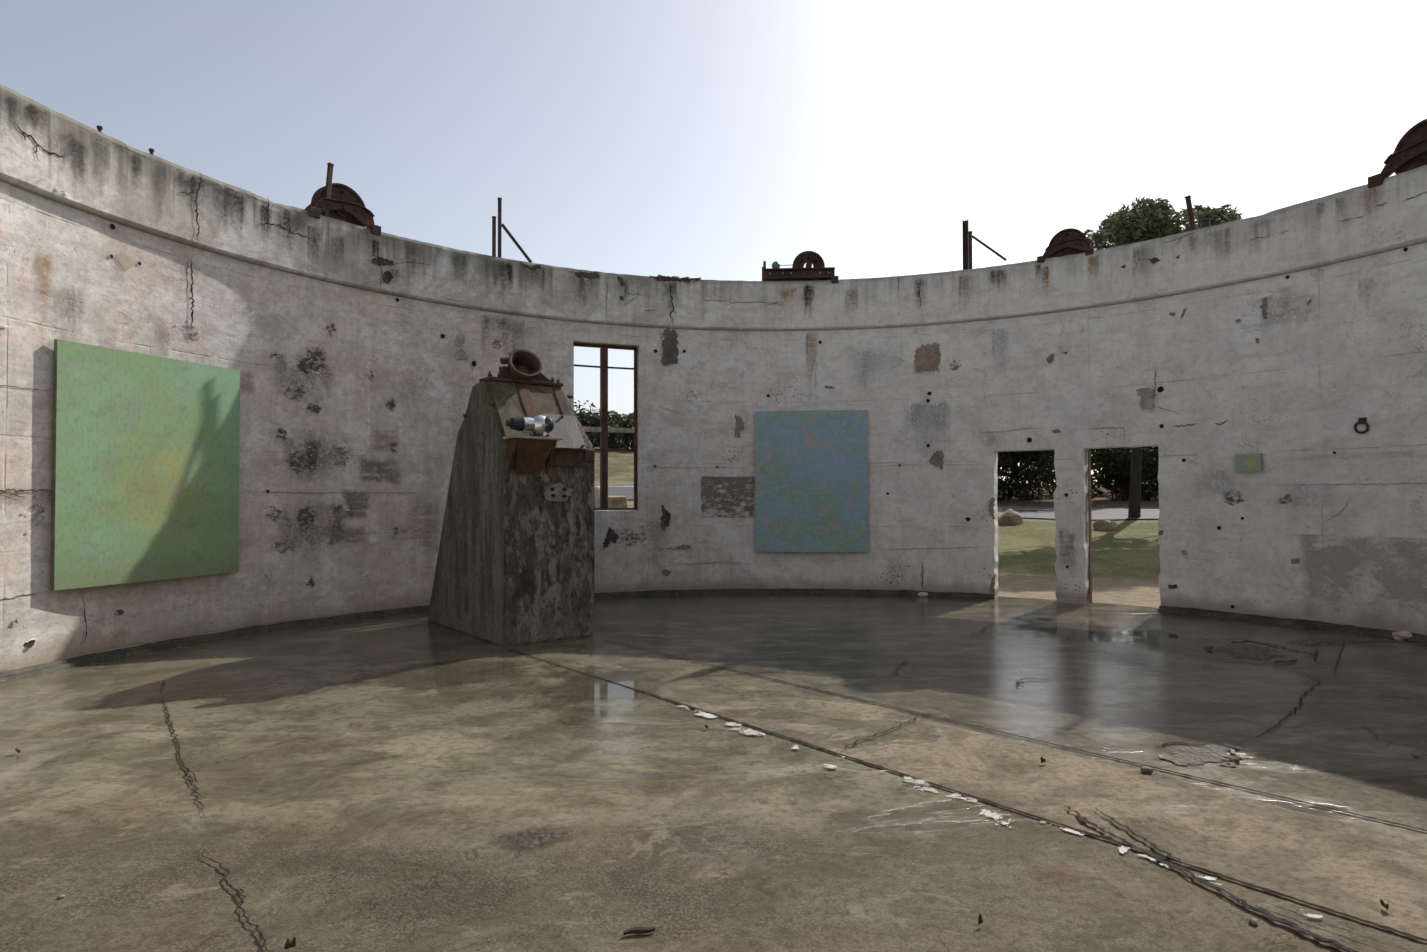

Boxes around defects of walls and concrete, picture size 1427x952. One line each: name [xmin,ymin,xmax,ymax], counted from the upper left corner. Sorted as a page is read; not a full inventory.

crack [13,122,66,161]
damp [157,169,204,199]
damp [261,206,293,235]
crack [179,171,202,331]
spalling [661,328,680,367]
spalling [913,342,962,375]
crack [0,488,52,497]
crack [1191,638,1358,744]
spalling [1156,742,1243,766]
crack [160,679,273,952]